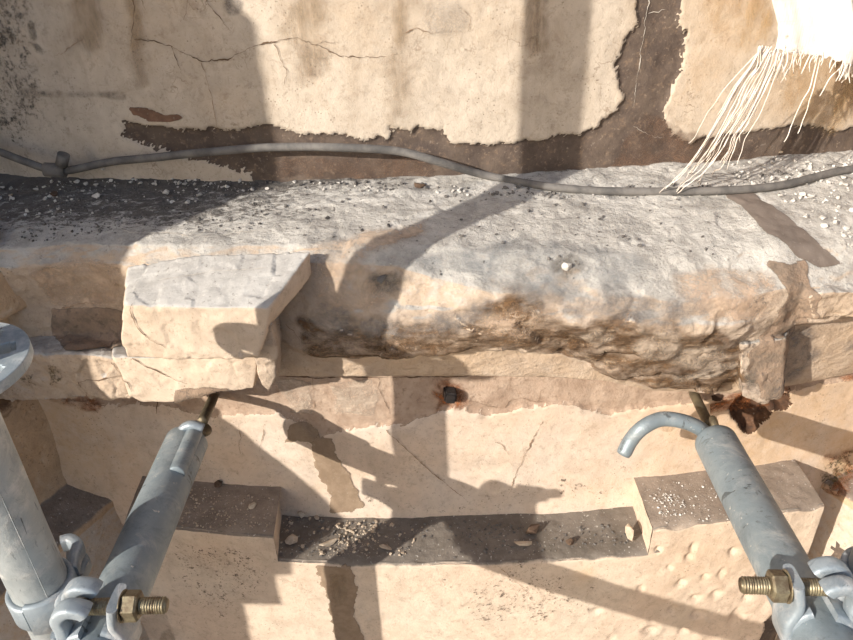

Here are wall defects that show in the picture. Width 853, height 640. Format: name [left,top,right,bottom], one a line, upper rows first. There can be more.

crack [130,0,471,126]
flaking render [120,0,853,188]
crack [634,0,665,102]
spalling [535,259,574,288]
crack [78,358,186,407]
leakage [285,422,377,513]
crack [285,376,467,497]
crack [463,379,554,498]
peeling [285,534,298,545]
peeling [514,524,540,546]
peeling [625,524,634,541]
leakage [316,564,364,640]